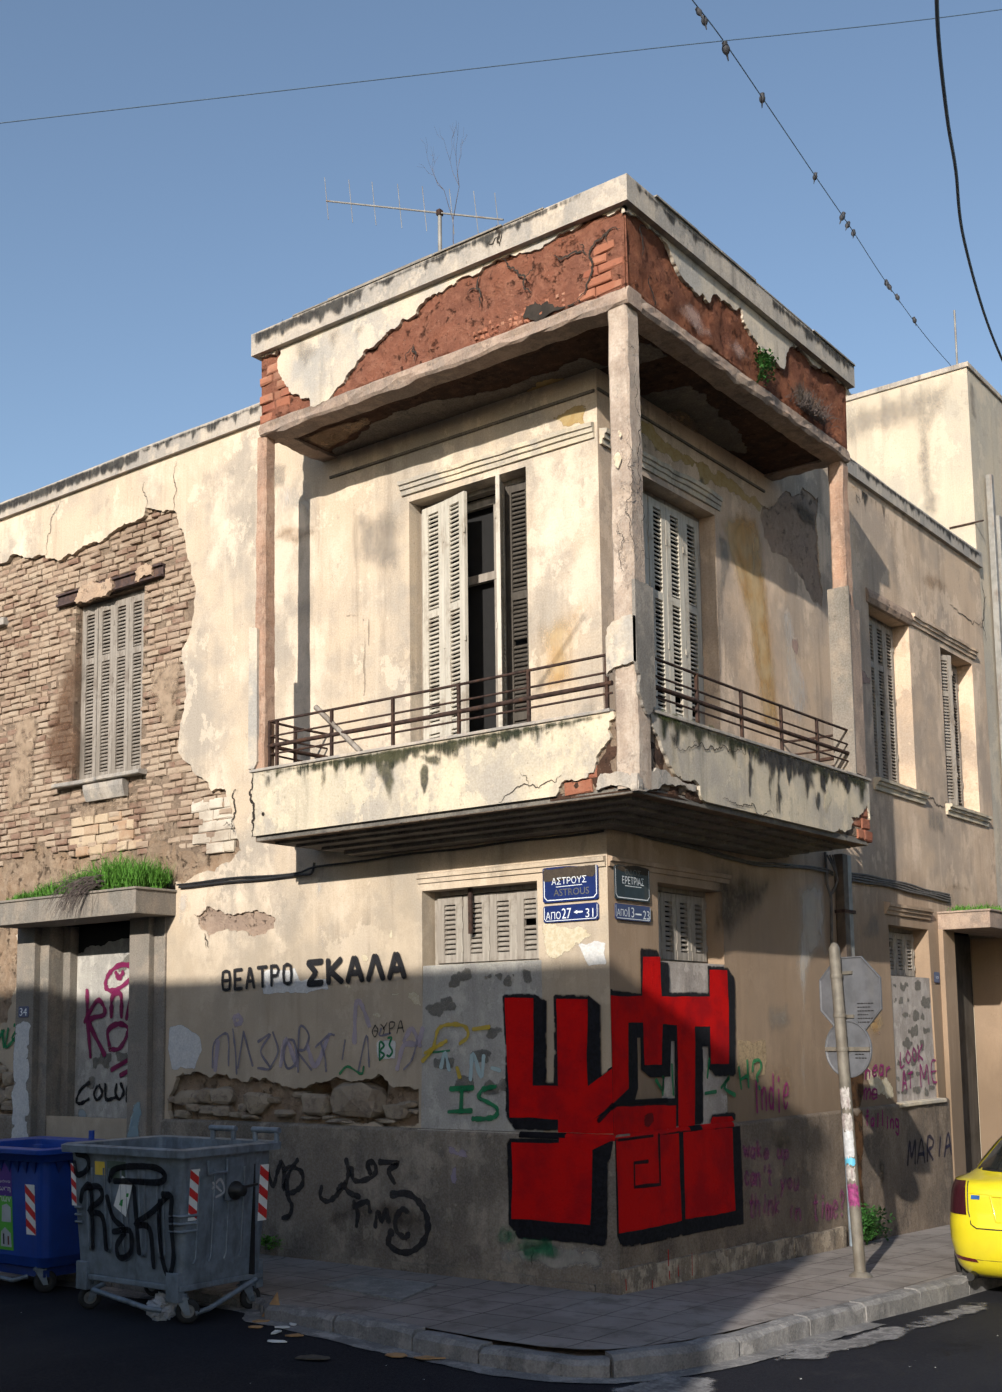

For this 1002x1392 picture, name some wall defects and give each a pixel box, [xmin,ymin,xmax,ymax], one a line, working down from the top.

flaking render [0,509,241,901]
flaking render [0,928,18,1114]